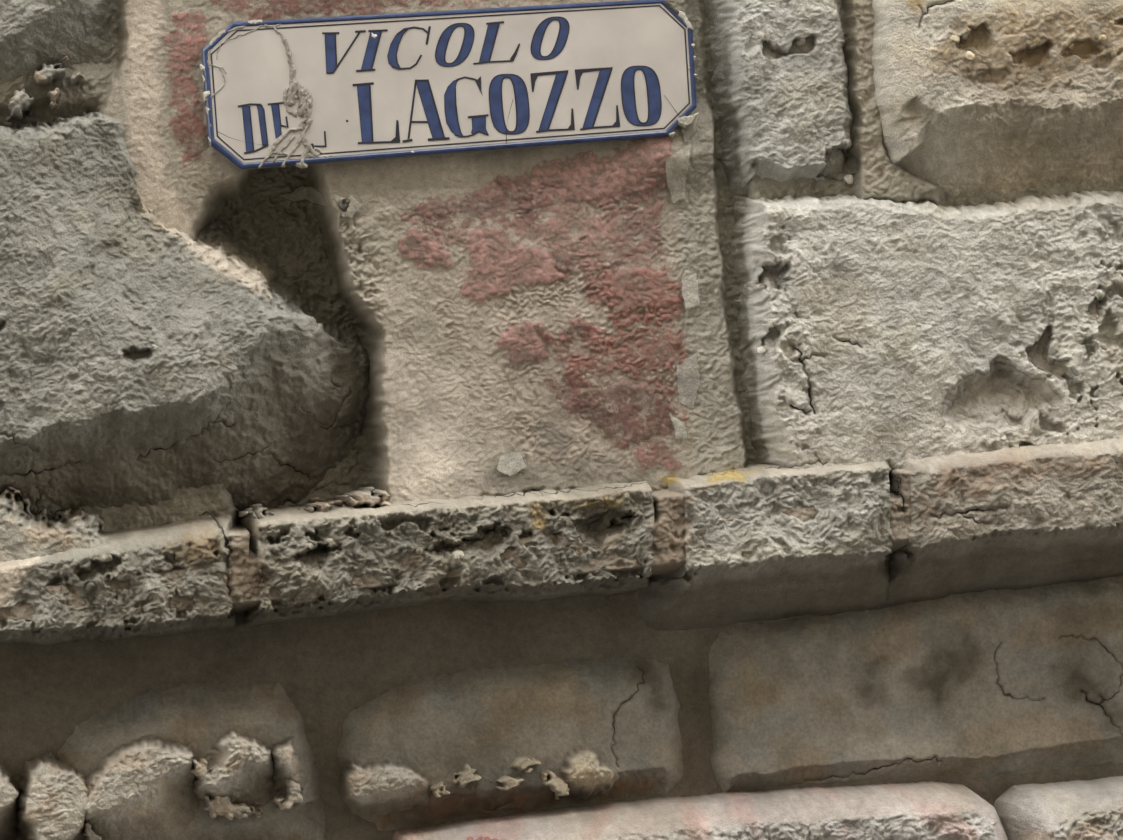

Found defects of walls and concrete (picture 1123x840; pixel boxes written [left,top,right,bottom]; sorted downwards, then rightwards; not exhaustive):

peeling [398,113,701,472]
peeling [497,450,527,476]
crack [1085,649,1121,718]